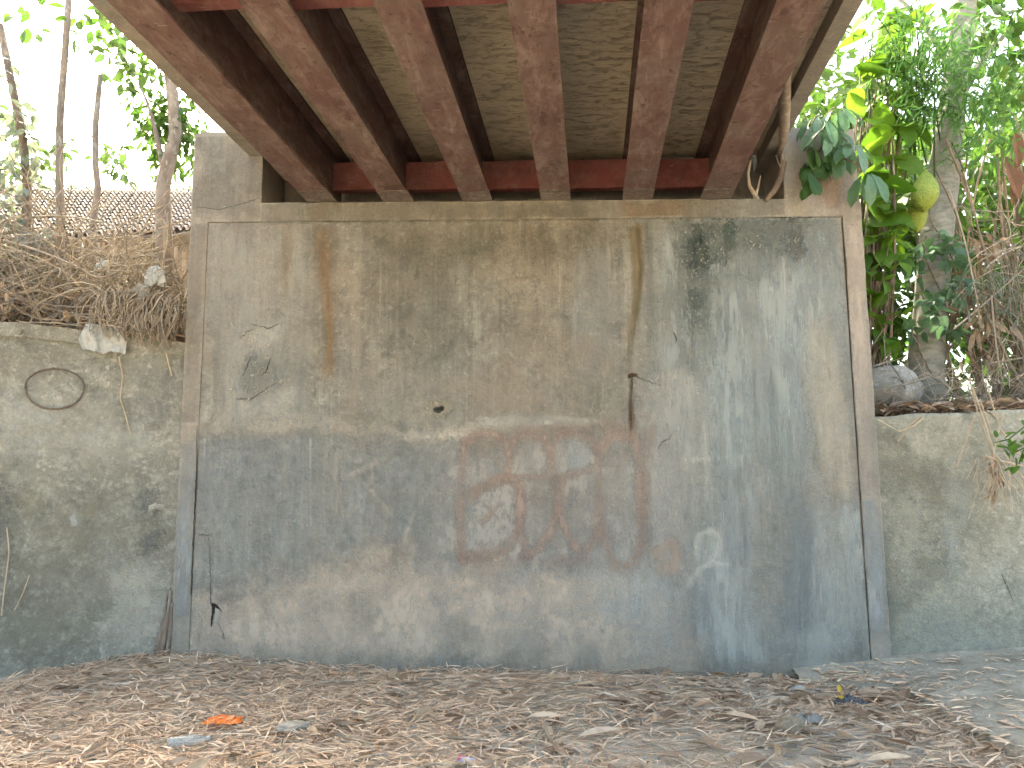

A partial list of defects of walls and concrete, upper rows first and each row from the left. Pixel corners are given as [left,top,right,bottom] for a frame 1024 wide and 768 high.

crack [153,430,225,656]
water stain [176,448,252,615]
water stain [332,217,842,668]